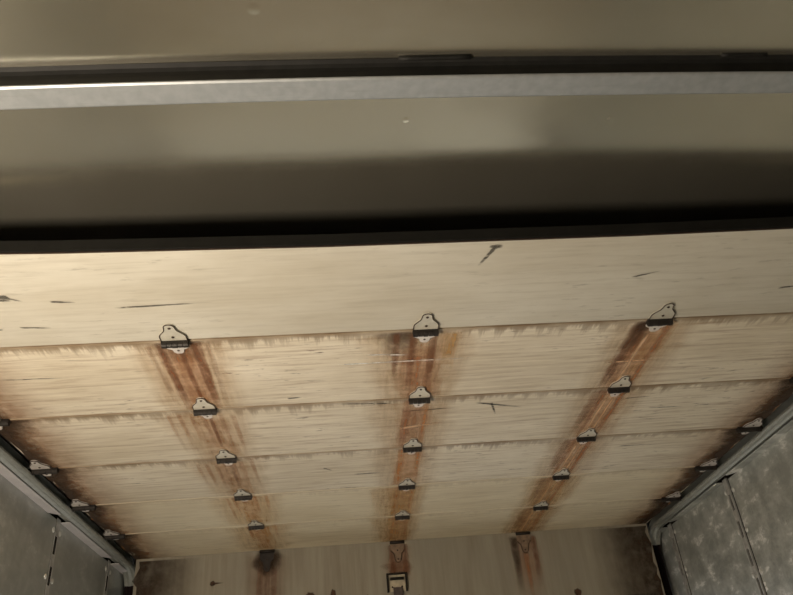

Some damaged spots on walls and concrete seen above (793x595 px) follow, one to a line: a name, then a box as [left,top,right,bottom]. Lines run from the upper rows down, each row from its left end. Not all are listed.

rust [158,344,214,397]
rust [390,333,457,439]
rust [606,323,668,380]